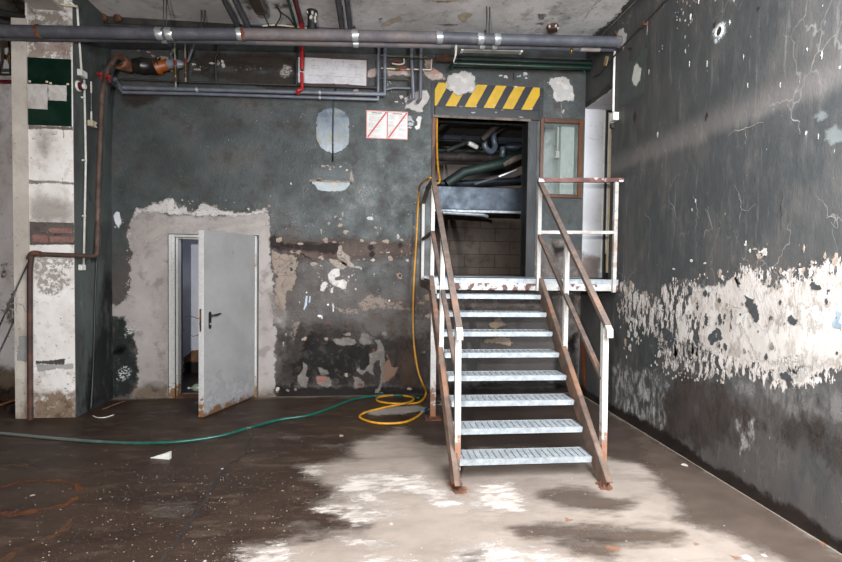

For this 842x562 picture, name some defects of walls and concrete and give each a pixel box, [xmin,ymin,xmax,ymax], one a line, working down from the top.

spalling [712,22,726,44]
water stain [534,230,601,278]
flaking render [112,195,430,398]
spalling [483,317,513,346]
peeling [617,241,842,422]
water stain [0,274,588,562]
water stain [579,360,842,562]
water stain [541,489,635,510]
water stain [452,523,683,562]